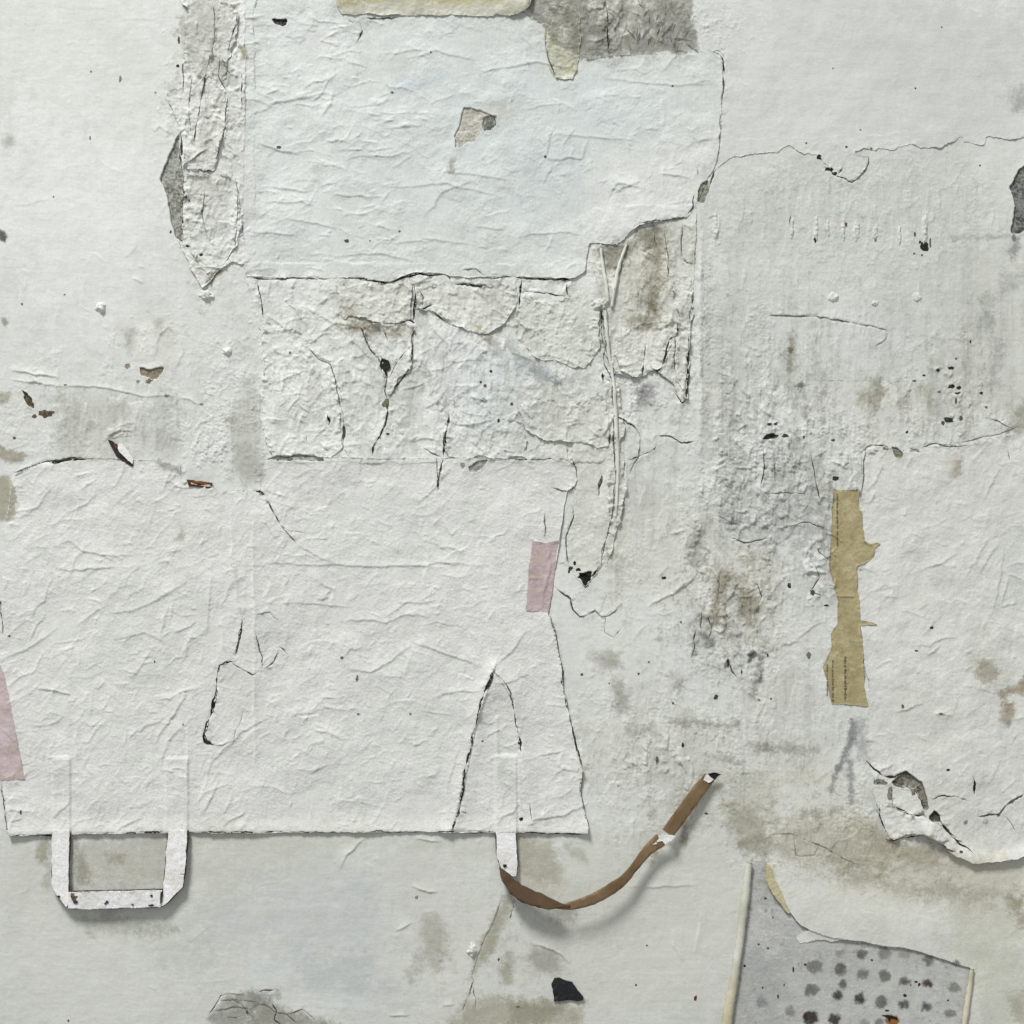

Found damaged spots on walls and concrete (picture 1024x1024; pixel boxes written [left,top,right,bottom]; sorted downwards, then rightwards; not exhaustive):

peeling [160,0,256,288]
peeling [1010,167,1024,241]
crack [255,253,694,835]
peeling [873,771,949,842]